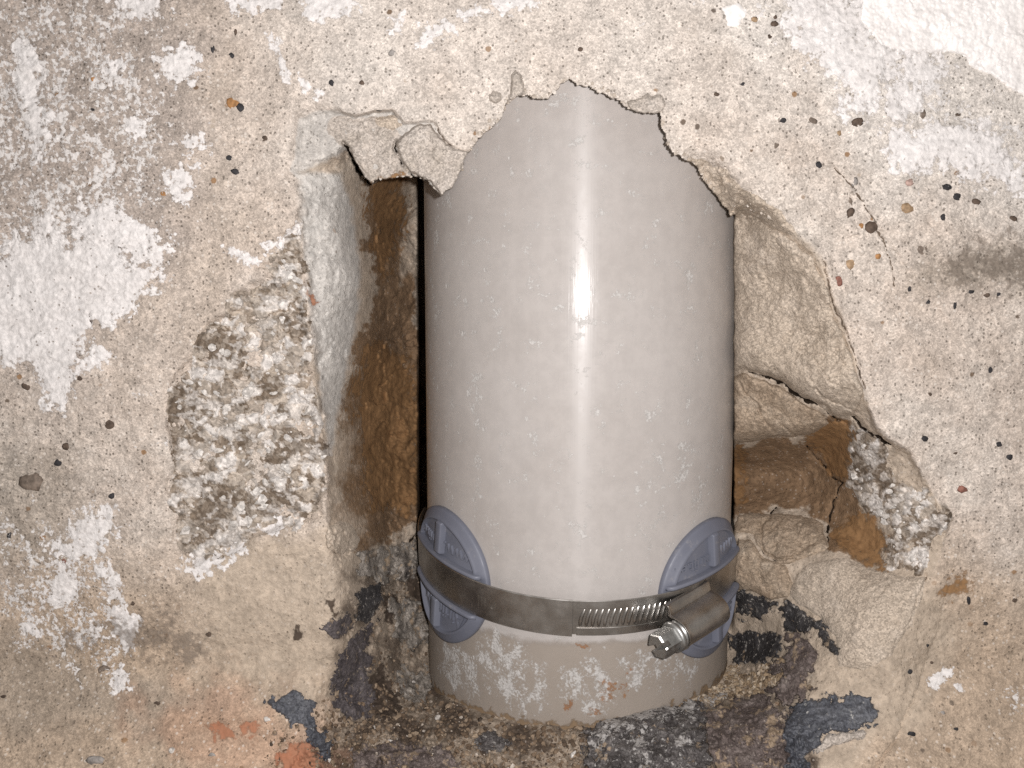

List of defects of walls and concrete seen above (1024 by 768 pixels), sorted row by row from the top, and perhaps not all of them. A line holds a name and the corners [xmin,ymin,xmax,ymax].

water stain [0,0,213,418]
spalling [327,114,469,196]
peeling [488,70,526,104]
crack [834,168,895,287]
water stain [750,0,1024,199]
spalling [166,226,333,561]
crack [748,261,891,446]
crack [795,436,844,542]
spalling [845,425,952,577]
water stain [0,500,147,695]
water stain [728,589,841,667]
water stain [782,691,879,768]